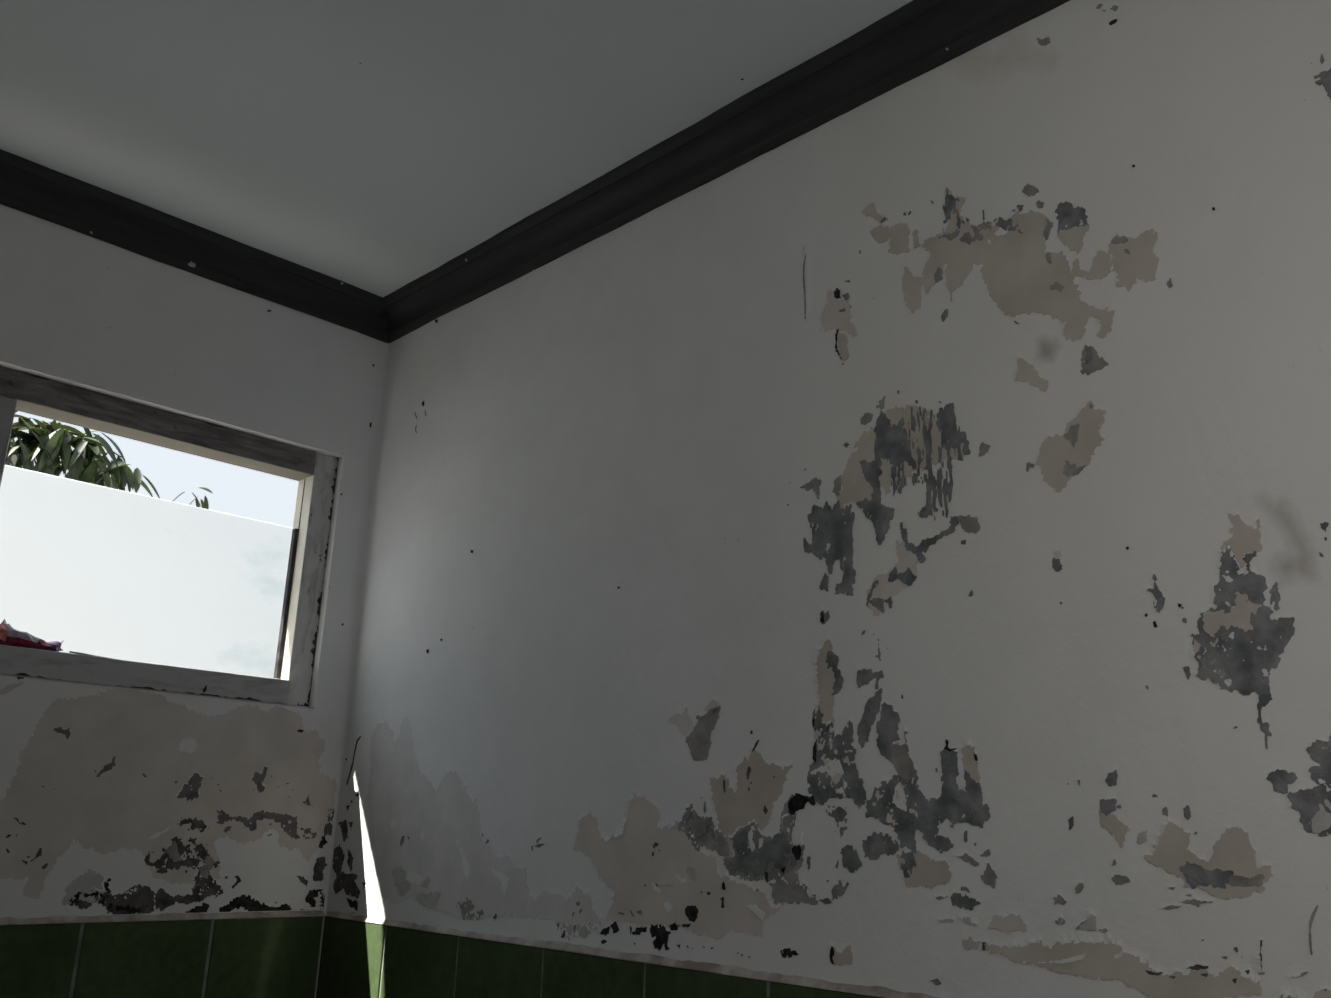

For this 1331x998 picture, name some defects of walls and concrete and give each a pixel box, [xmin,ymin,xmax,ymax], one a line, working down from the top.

peeling [1311,54,1331,99]
peeling [860,184,1173,392]
peeling [0,687,338,899]
peeling [366,390,1331,998]